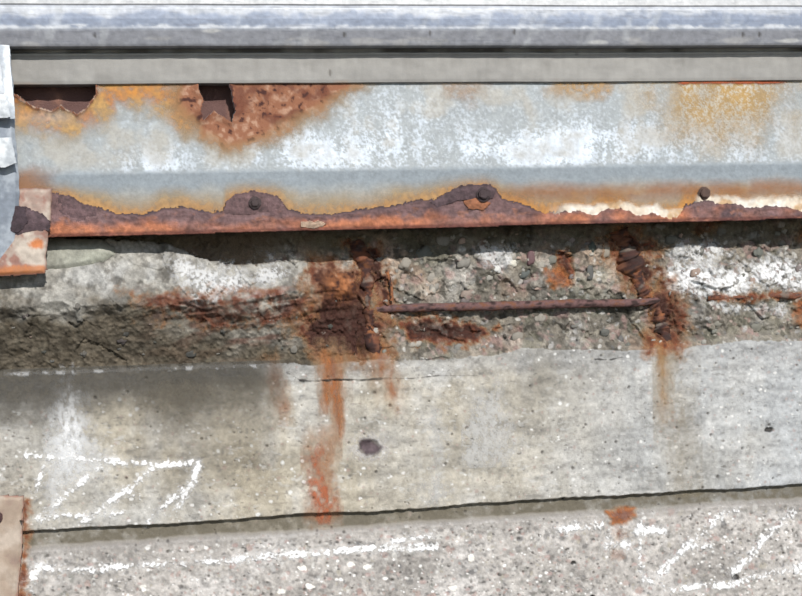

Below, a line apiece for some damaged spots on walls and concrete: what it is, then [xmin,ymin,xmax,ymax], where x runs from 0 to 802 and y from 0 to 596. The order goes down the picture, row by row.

corrosion [14,83,365,154]
corrosion [19,173,802,375]
spalling [66,195,802,361]
water stain [663,243,802,312]
corrosion [147,241,501,435]
corrosion [308,442,334,522]
corrosion [605,506,636,525]